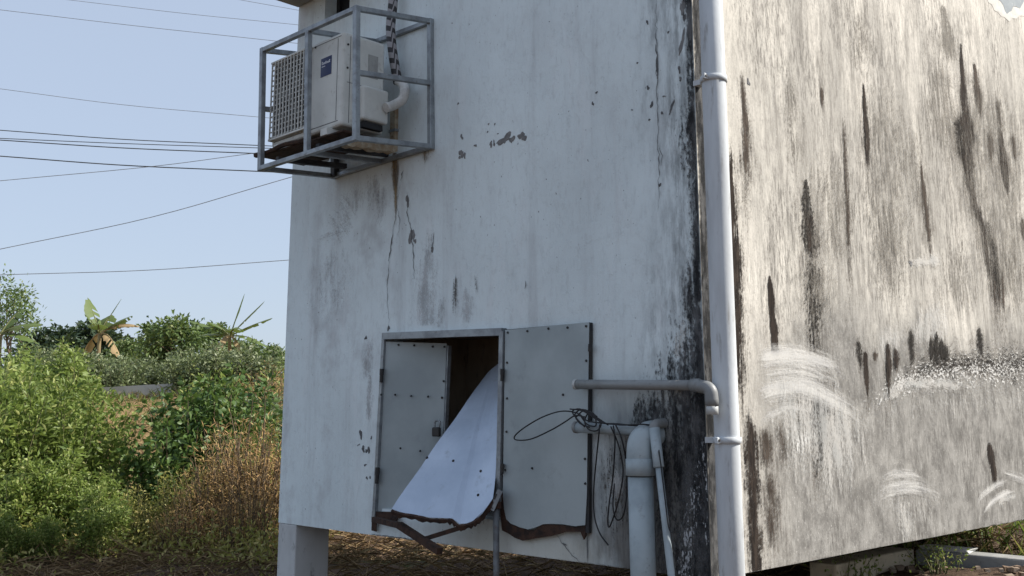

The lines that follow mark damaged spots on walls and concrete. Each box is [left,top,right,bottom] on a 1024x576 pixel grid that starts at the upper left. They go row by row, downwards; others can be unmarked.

peeling [458,123,527,159]
water stain [740,76,752,186]
crack [387,172,434,325]
mould [631,0,719,576]
water stain [760,5,1024,548]
rust [371,493,587,541]